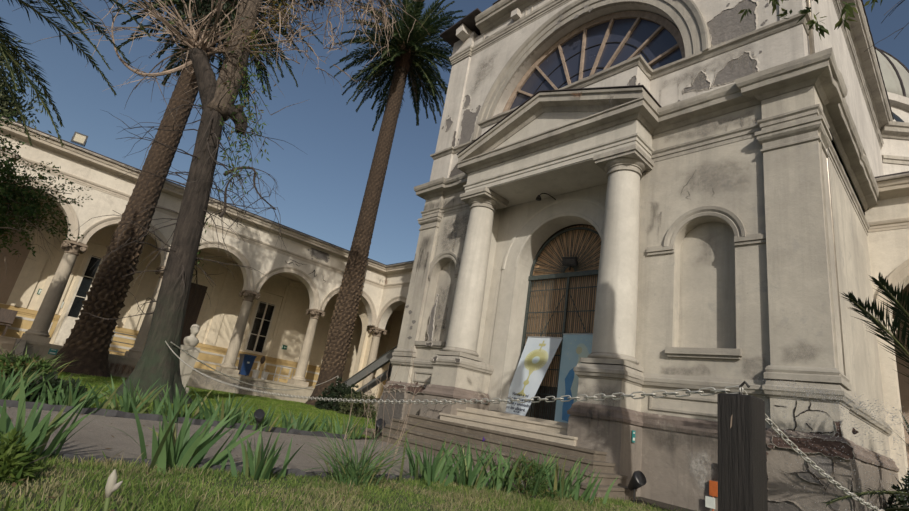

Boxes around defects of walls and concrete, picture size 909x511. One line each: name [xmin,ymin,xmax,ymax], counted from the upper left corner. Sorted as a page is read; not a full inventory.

flaking render [706,0,769,47]
flaking render [678,51,762,102]
flaking render [442,94,482,147]
crack [774,400,834,434]
flaking render [772,420,858,478]
crack [781,460,855,511]